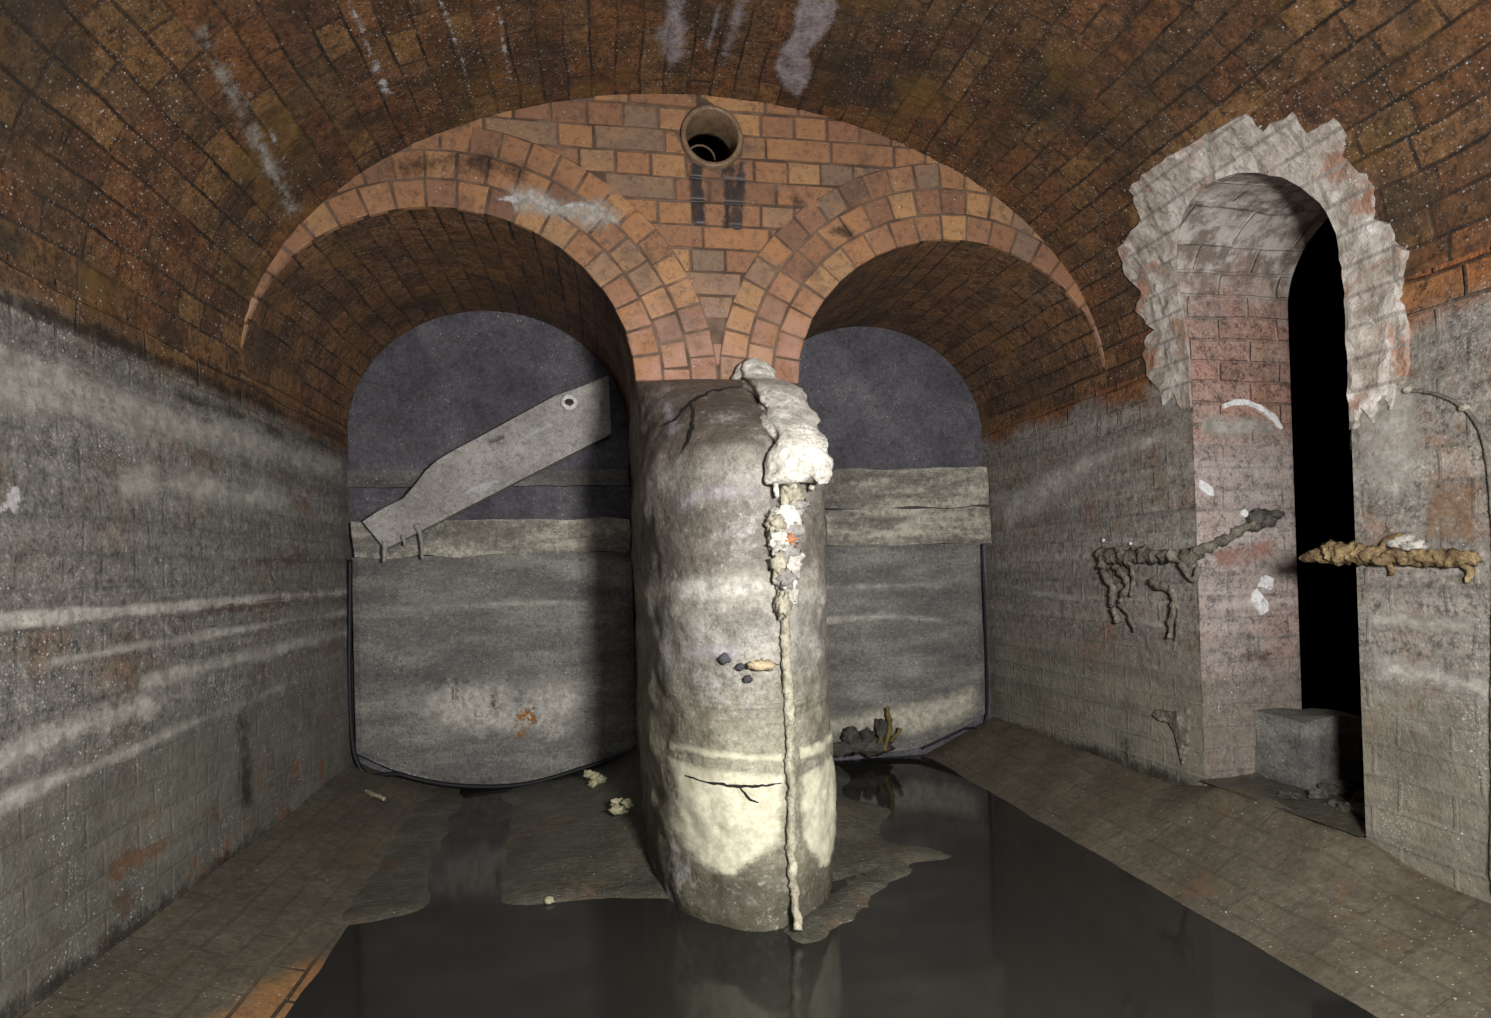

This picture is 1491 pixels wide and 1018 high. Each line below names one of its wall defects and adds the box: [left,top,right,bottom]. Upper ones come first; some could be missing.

efflorescence [659,0,687,62]
efflorescence [775,0,835,94]
efflorescence [498,186,620,229]
peeling [1117,112,1416,492]
damp [0,588,347,815]
damp [0,890,187,1018]